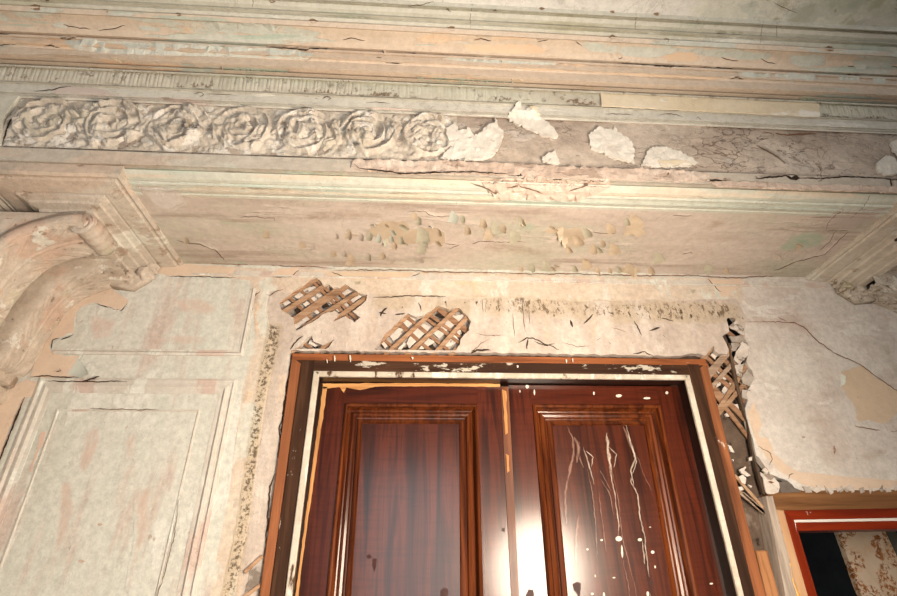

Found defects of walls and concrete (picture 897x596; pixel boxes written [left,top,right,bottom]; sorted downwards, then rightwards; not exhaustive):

spalling [351,159,710,182]
crack [177,238,248,265]
peeling [324,211,526,281]
crack [252,132,897,310]
peeling [540,214,666,279]
crack [373,295,446,316]
peeling [0,289,129,459]
crack [745,315,897,390]
peeling [839,366,897,424]
peeling [748,400,897,495]